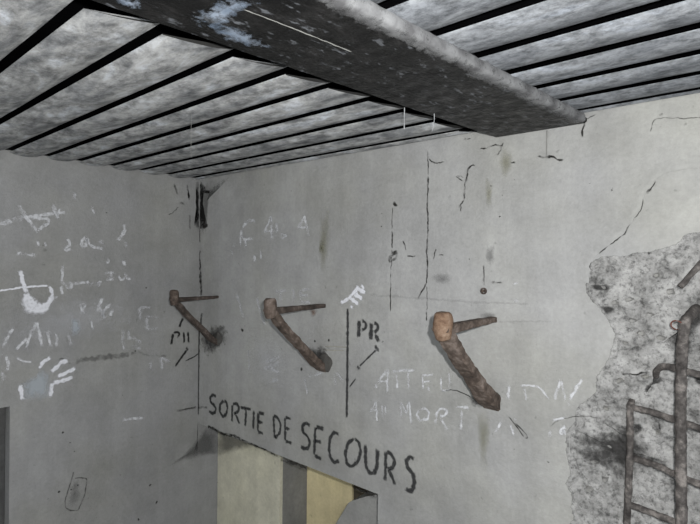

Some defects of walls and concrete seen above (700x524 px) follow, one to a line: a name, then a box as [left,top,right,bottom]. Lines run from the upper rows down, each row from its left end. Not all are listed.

crack [389,159,442,310]
spalling [566,233,700,524]